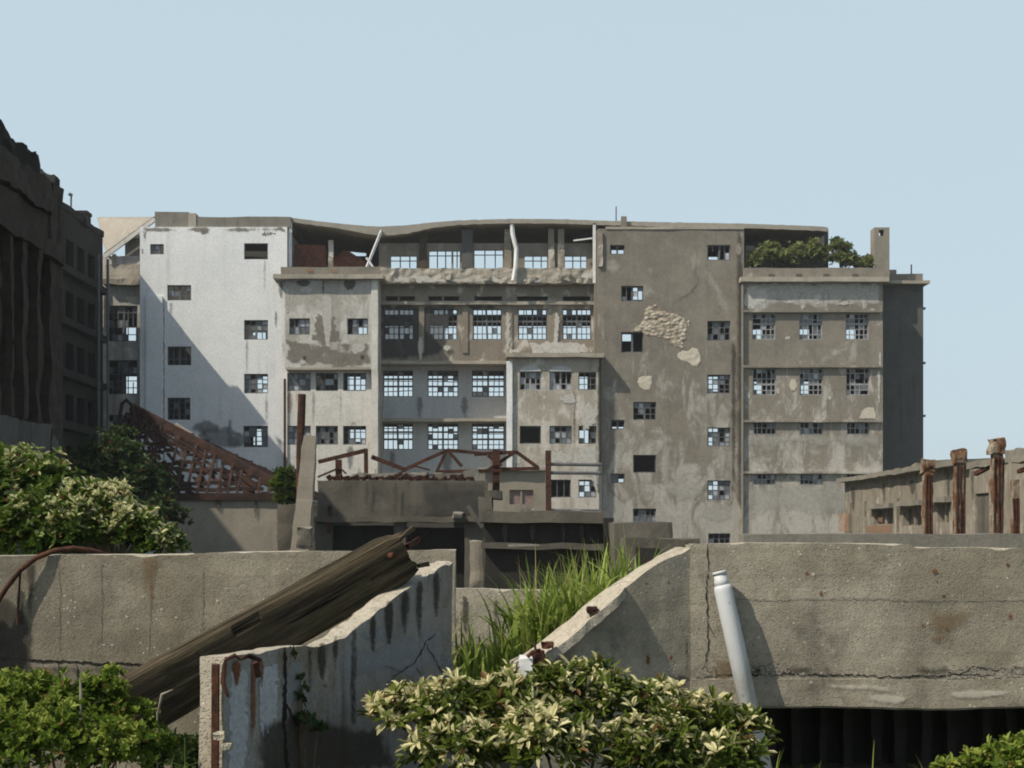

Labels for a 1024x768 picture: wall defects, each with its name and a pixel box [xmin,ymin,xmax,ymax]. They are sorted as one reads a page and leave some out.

peeling [286,286,370,367]
spalling [634,305,690,349]
rust [326,472,475,481]
water stain [370,572,440,651]
crack [692,546,1024,680]
crack [385,633,444,683]
rust [234,660,264,729]